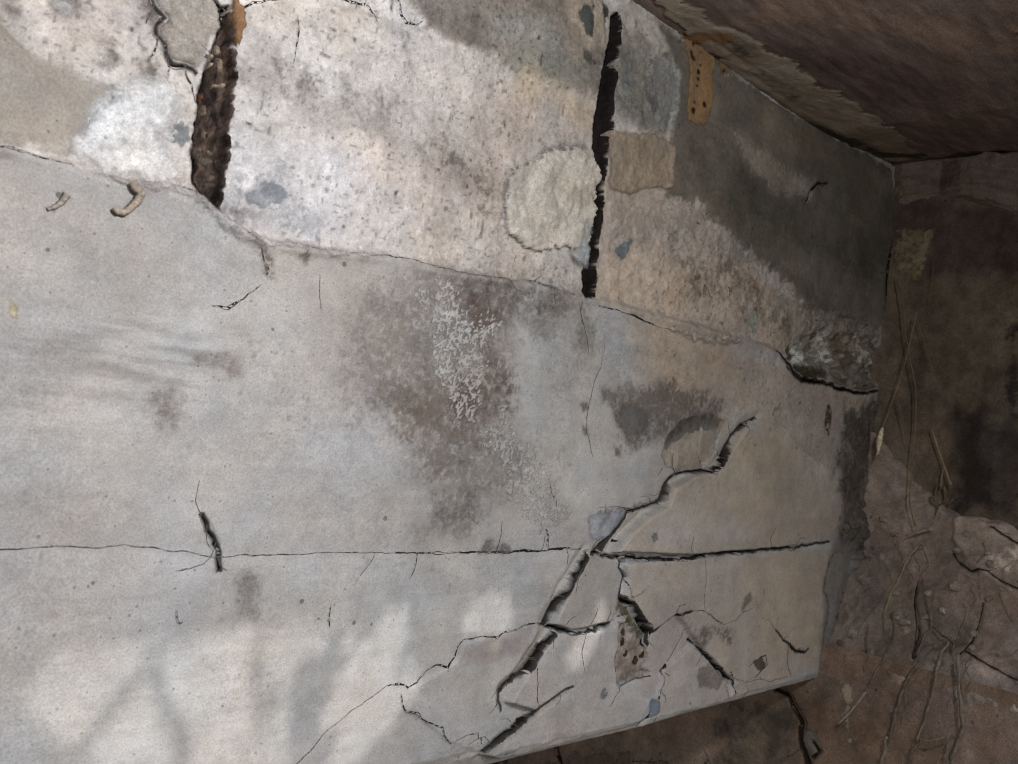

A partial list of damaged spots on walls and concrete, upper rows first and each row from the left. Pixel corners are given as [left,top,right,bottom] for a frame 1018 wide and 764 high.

crack [213,0,279,11]
crack [344,0,423,26]
crack [145,0,211,104]
corrosion [682,32,735,126]
crack [0,145,72,164]
leakage [353,270,578,527]
crack [212,229,736,456]
leakage [608,377,723,448]
crack [776,350,879,396]
spalling [785,326,878,390]
crack [0,416,830,764]
spalling [614,622,646,684]